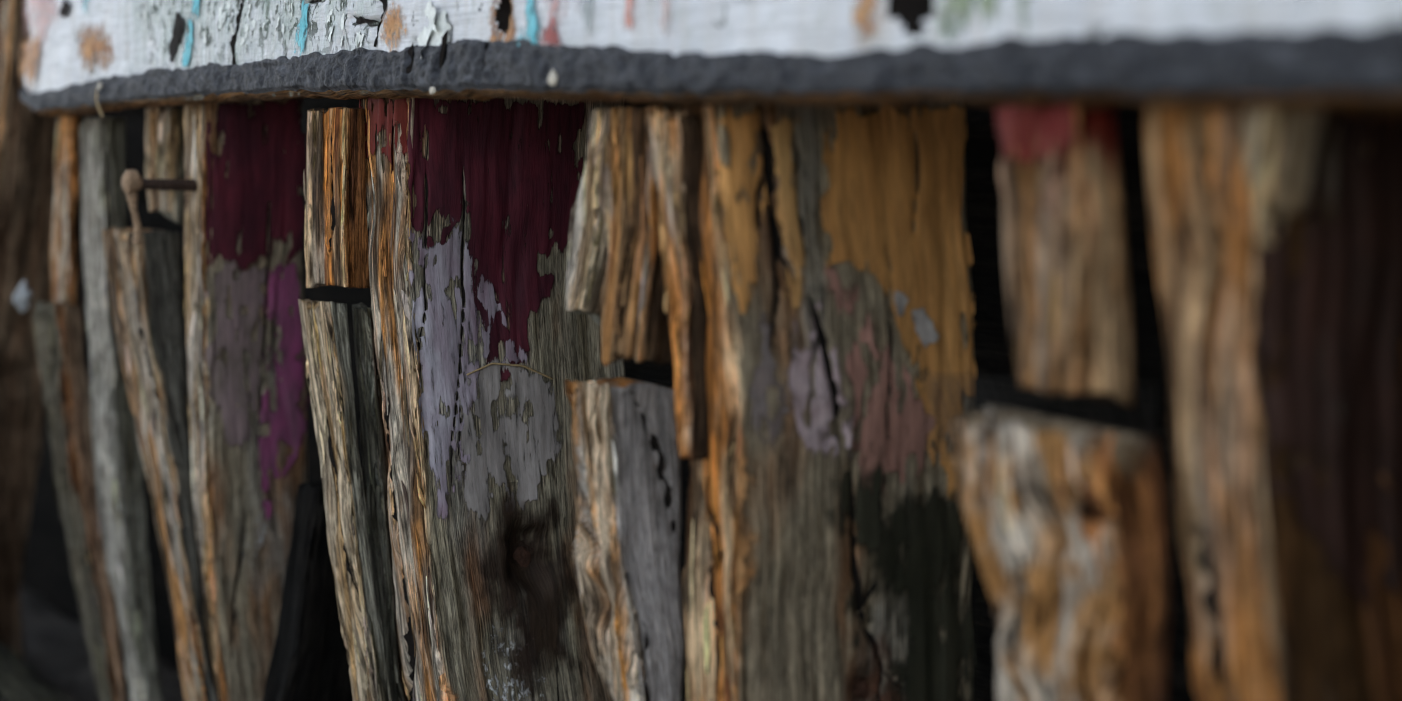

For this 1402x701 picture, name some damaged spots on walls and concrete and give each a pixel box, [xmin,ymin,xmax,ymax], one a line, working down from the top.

peeling [59,0,70,17]
peeling [138,0,293,65]
peeling [322,0,364,48]
peeling [417,1,451,52]
spalling [495,0,513,35]
spalling [887,0,934,36]
rust [126,192,143,244]
peeling [358,98,585,522]
crack [755,111,904,701]